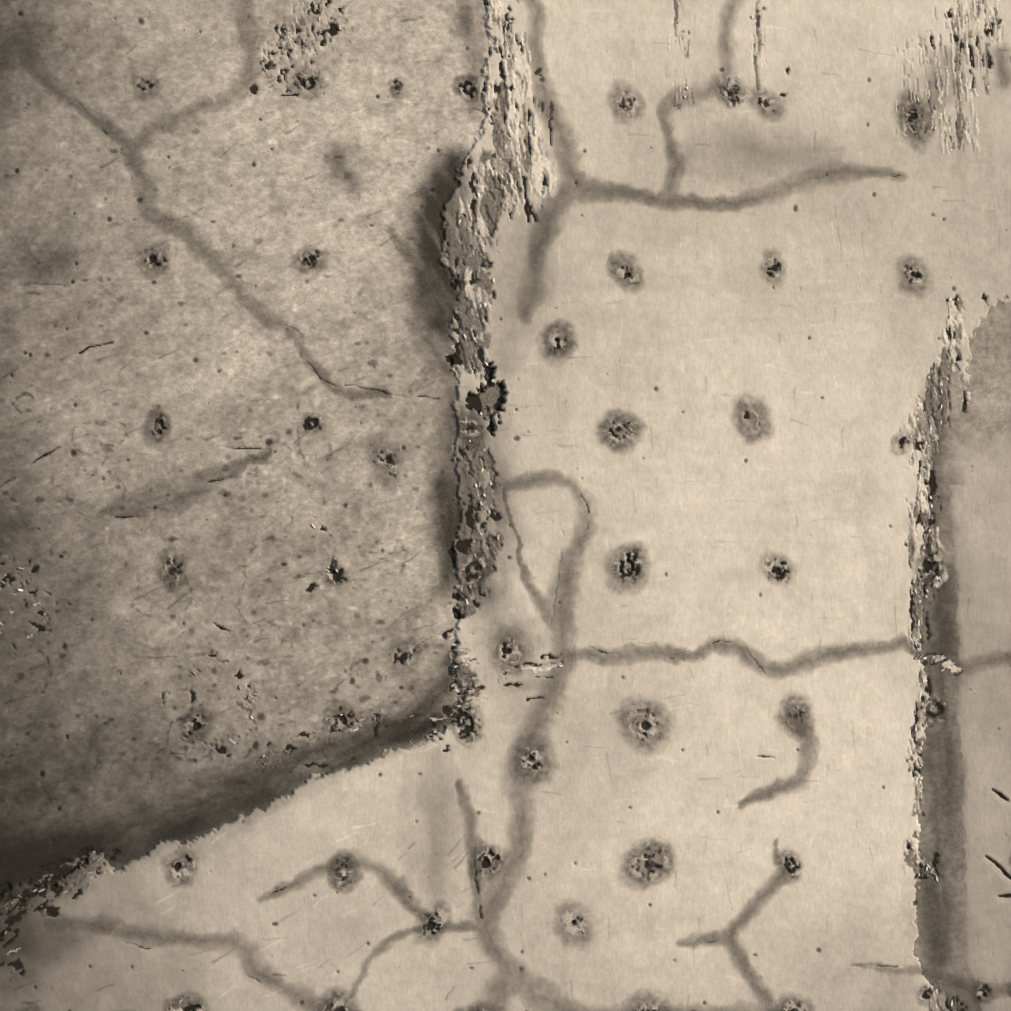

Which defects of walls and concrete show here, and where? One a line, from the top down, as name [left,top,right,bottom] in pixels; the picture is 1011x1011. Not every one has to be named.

crack [148,213,391,397]
water stain [412,151,464,336]
crack [517,0,899,316]
peeling [0,0,557,947]
water stain [279,651,479,784]
crack [266,473,919,1011]
water stain [918,552,952,654]
peeling [899,293,1011,1011]
water stain [0,781,278,900]
water stain [331,854,357,889]
spalling [0,959,24,975]
crack [51,920,334,1011]